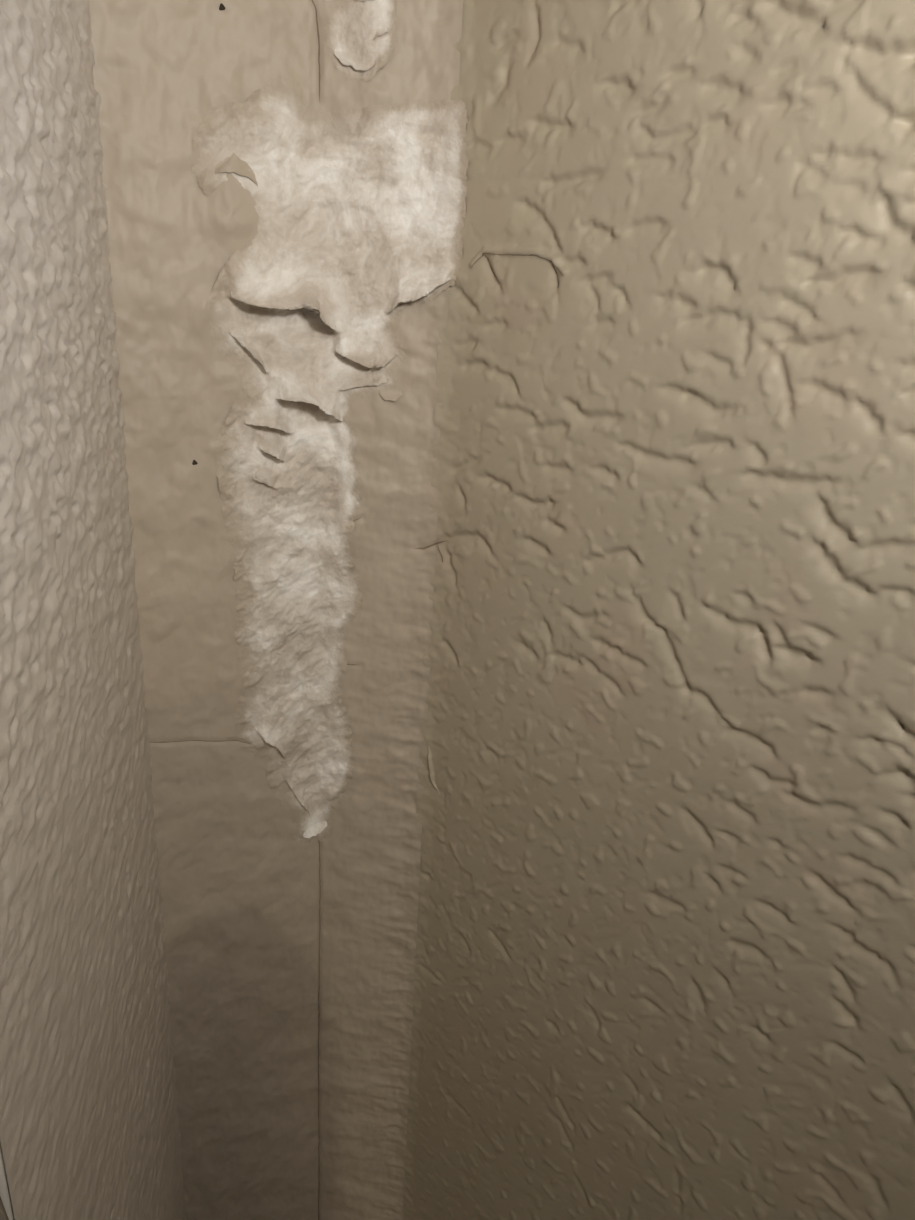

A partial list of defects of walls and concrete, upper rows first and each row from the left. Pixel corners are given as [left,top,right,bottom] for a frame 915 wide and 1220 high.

flaking render [323,0,398,82]
flaking render [192,75,469,845]